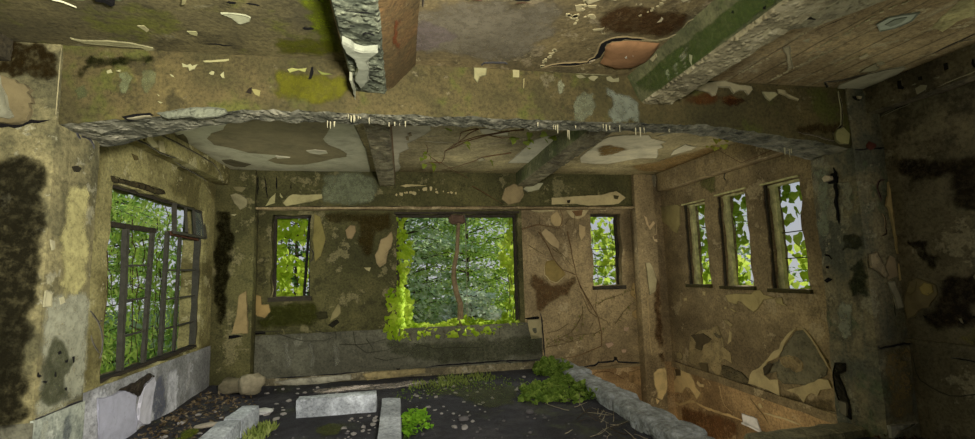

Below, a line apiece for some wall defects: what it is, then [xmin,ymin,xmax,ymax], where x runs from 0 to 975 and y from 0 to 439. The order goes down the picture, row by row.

peeling [182,59,229,78]
peeling [122,94,370,172]
crack [798,74,866,141]
water stain [0,156,89,439]
mould [213,212,234,324]
peeling [364,232,393,271]
peeling [531,191,625,249]
crack [822,167,840,224]
water stain [925,274,975,329]
crack [584,294,653,381]
flaking render [653,289,852,432]
peeling [97,373,156,439]